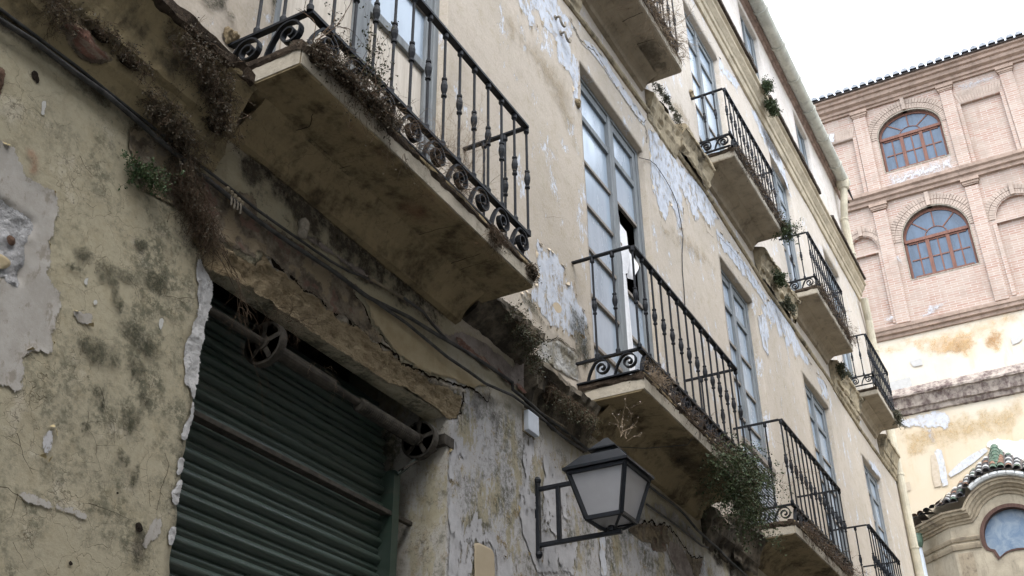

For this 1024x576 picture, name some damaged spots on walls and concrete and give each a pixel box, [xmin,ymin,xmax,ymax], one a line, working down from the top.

peeling [519,0,811,381]
peeling [0,141,98,392]
mould [67,248,167,376]
spalling [129,126,486,440]
crack [266,255,490,422]
spalling [396,296,527,394]
mould [118,448,139,486]
spalling [171,457,185,505]
crack [642,519,704,560]